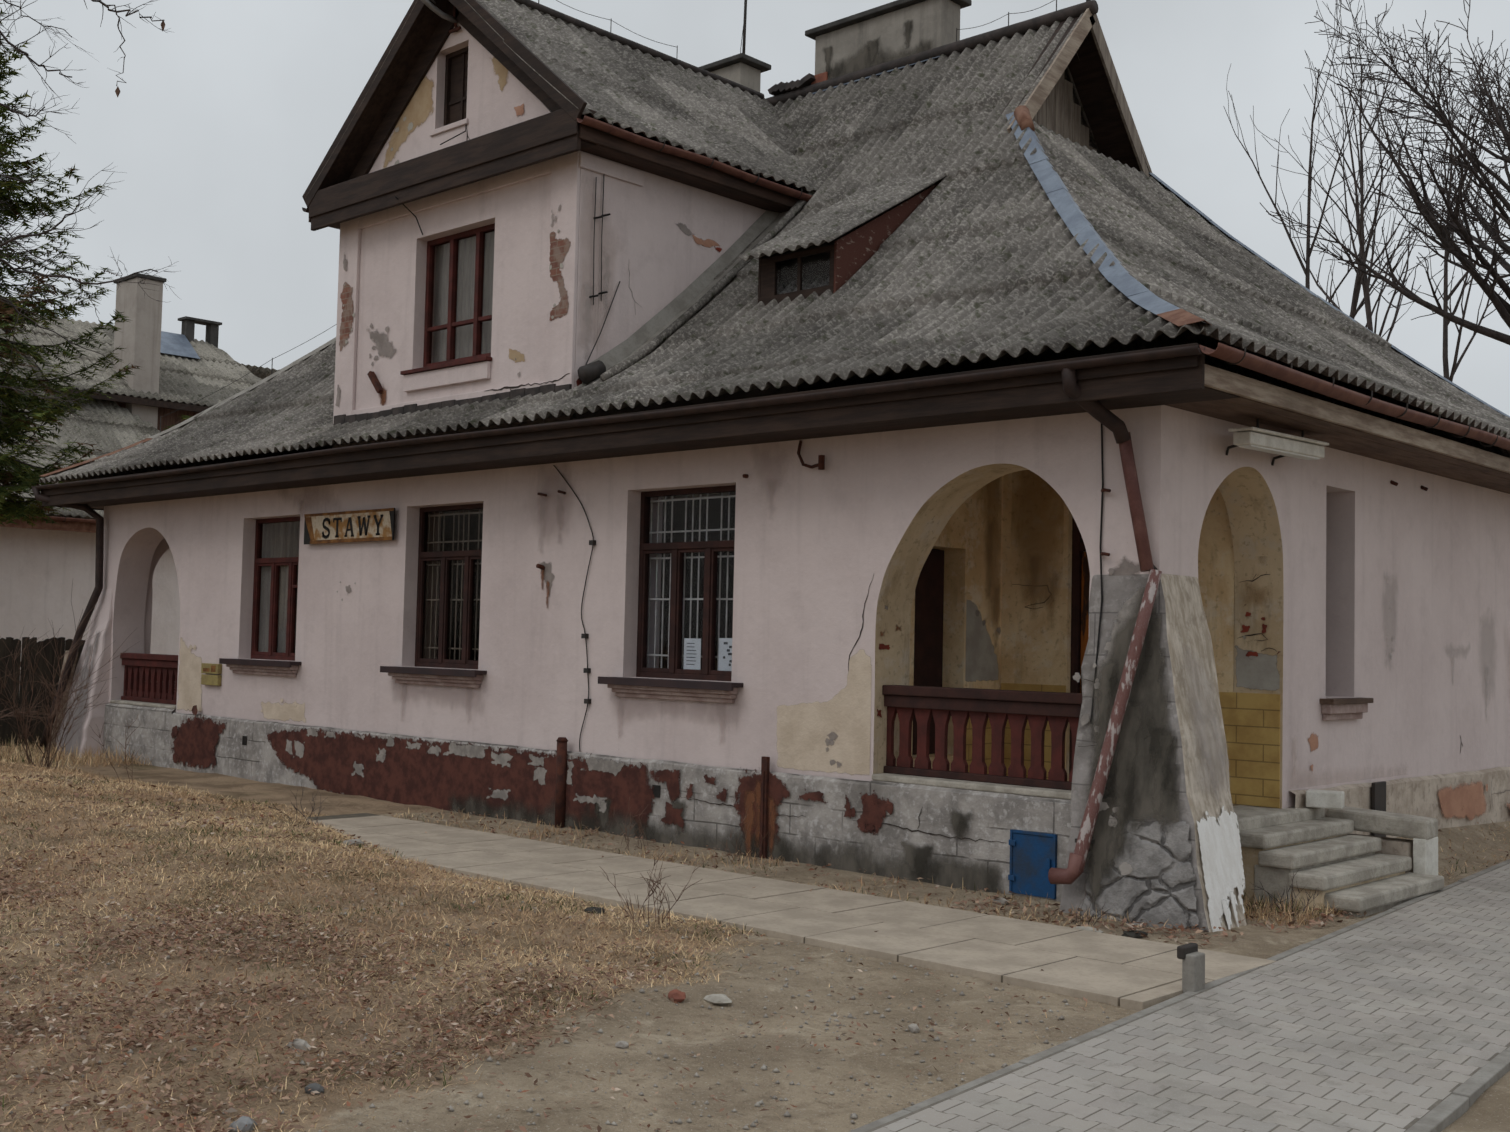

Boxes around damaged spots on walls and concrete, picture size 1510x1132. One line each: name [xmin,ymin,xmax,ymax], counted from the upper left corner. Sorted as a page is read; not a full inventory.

peeling [267,728,728,832]